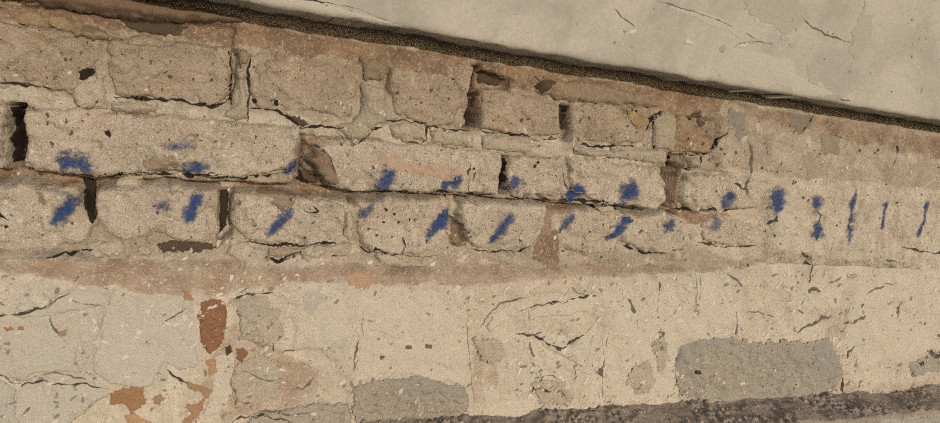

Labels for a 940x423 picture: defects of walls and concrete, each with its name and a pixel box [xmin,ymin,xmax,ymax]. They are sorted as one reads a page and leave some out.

spalling [266,183,295,212]
crack [0,51,661,213]
spalling [375,151,475,182]
spalling [687,111,705,127]
crack [673,143,754,213]
crack [246,238,437,264]
spalling [449,220,469,246]
crack [620,242,754,254]
flaking render [0,287,201,423]
crack [467,287,596,403]
flaking render [196,263,940,423]
crack [797,247,940,393]